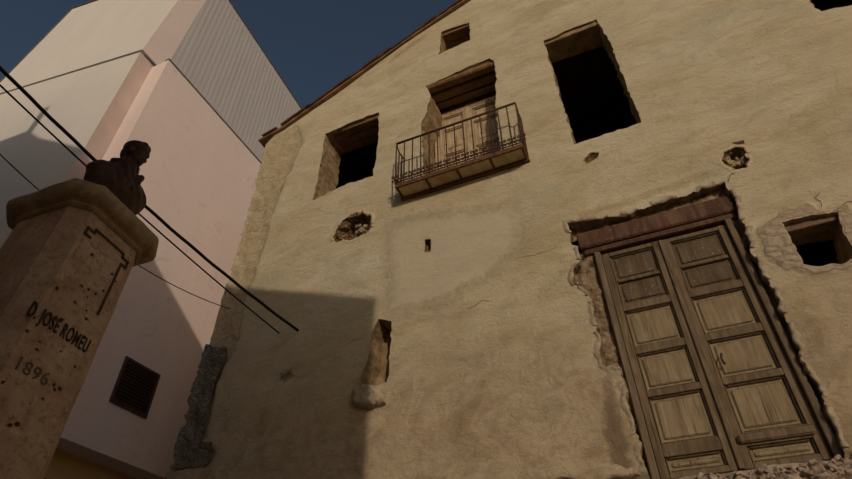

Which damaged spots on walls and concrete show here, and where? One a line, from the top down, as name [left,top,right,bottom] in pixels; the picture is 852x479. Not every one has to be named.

flaking render [165,125,302,479]
spalling [329,208,375,244]
flaking render [575,252,651,479]
spalling [717,140,753,173]
flaking render [724,219,823,419]